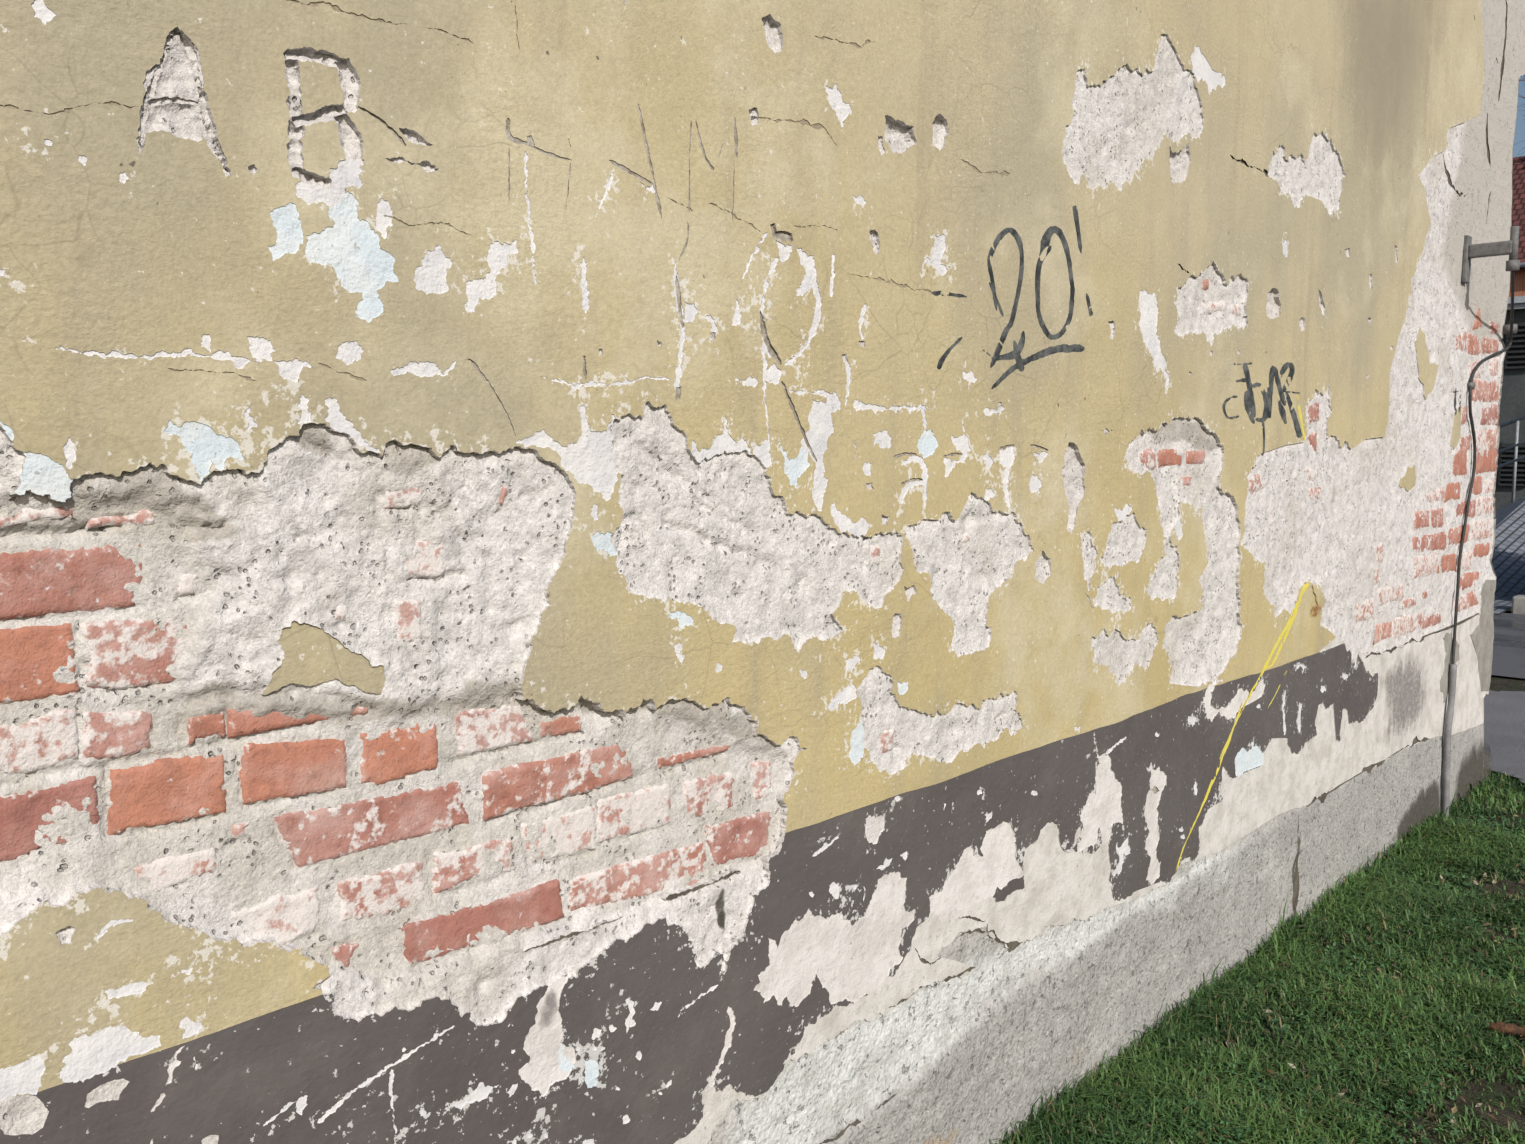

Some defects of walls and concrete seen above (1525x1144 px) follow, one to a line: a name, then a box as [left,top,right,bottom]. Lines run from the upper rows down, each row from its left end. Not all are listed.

crack [287,0,474,44]
crack [0,101,139,115]
peeling [268,180,519,322]
peeling [963,370,978,383]
spalling [1062,0,1525,725]
peeling [1282,692,1302,735]
spalling [0,391,1051,1112]
peeling [1235,741,1264,778]
peeling [1077,736,1167,885]
peeling [0,1025,161,1136]
peeling [201,1135,219,1144]